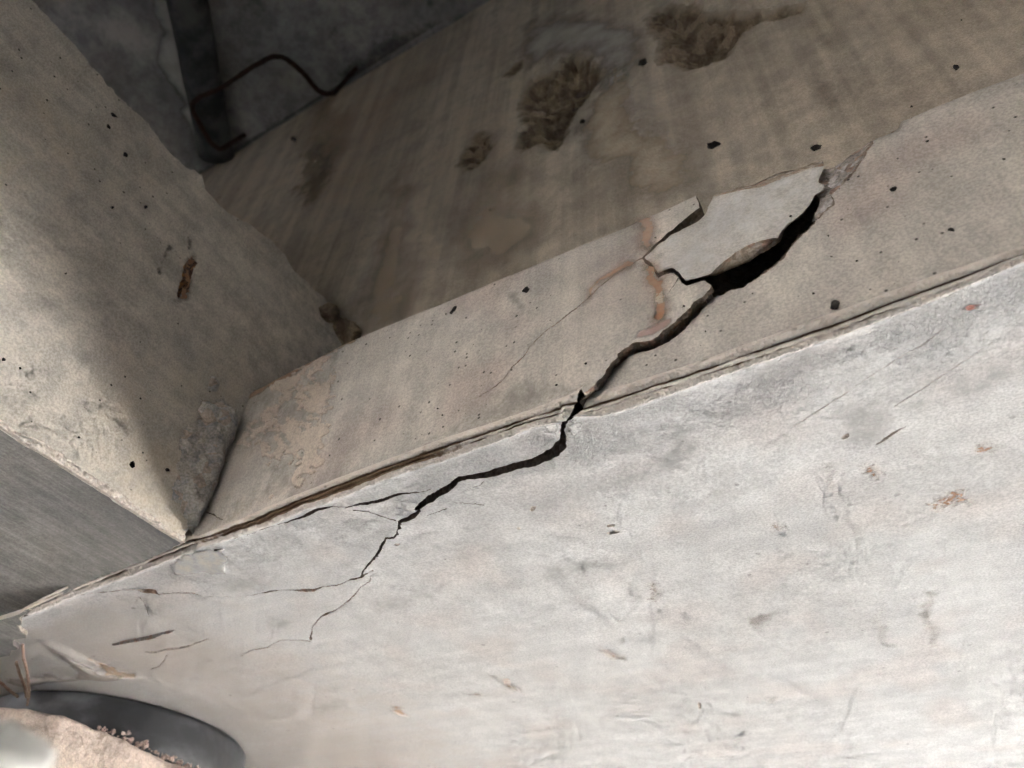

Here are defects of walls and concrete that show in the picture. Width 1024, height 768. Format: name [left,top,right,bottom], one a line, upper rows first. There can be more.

damp [525,21,684,192]
crack [207,129,897,642]
crack [82,589,198,614]